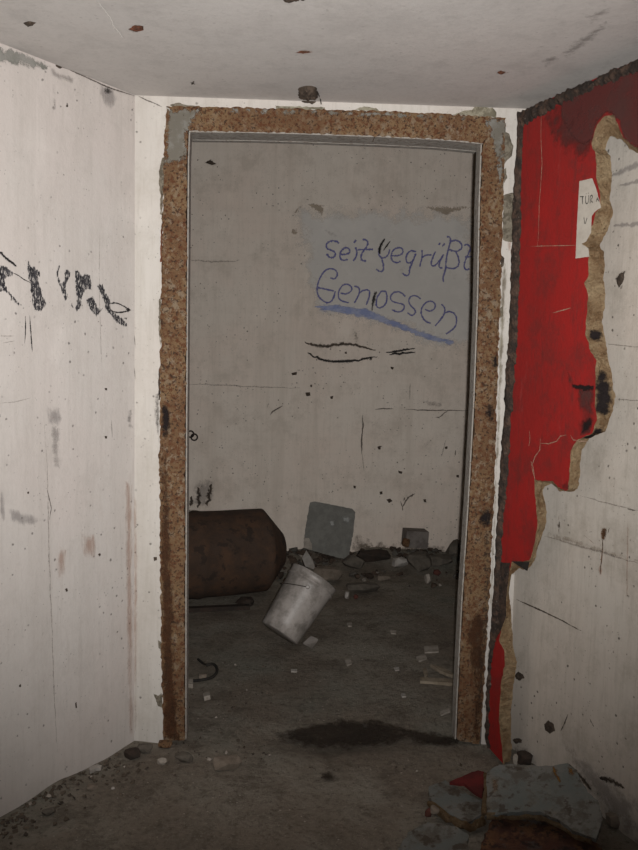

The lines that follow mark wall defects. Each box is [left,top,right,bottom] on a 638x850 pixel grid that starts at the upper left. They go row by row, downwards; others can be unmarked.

flaking render [504,132,513,182]
flaking render [502,193,514,242]
water stain [279,720,459,748]
spalling [544,715,568,734]